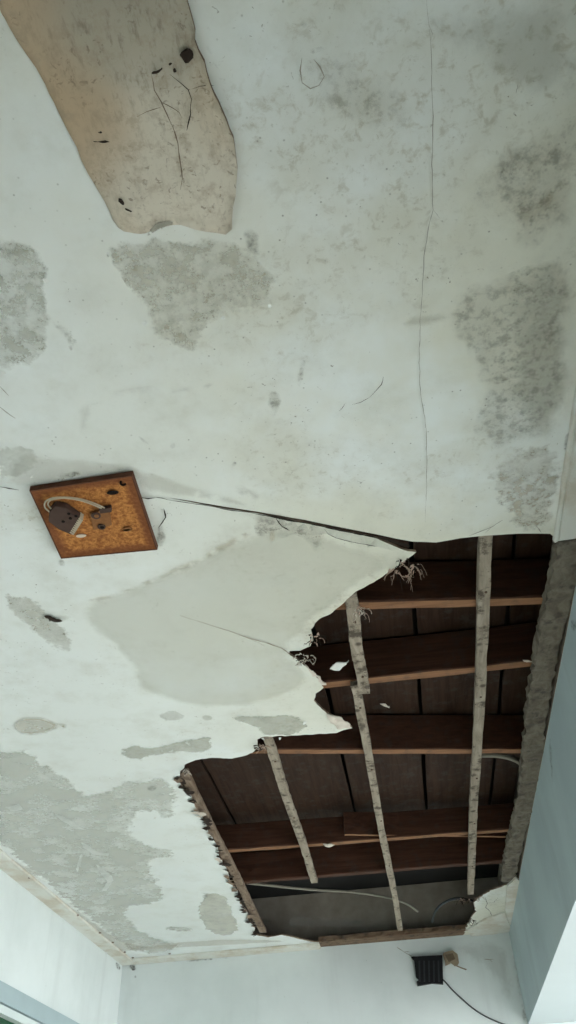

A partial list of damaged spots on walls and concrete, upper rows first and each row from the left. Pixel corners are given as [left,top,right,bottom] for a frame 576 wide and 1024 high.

spalling [152,48,193,74]
crack [137,74,213,190]
crack [420,11,439,316]
crack [419,342,427,513]
crack [142,497,410,547]
peeling [305,660,349,685]
peeling [236,715,307,740]
peeling [326,713,350,730]
peeling [174,777,259,937]